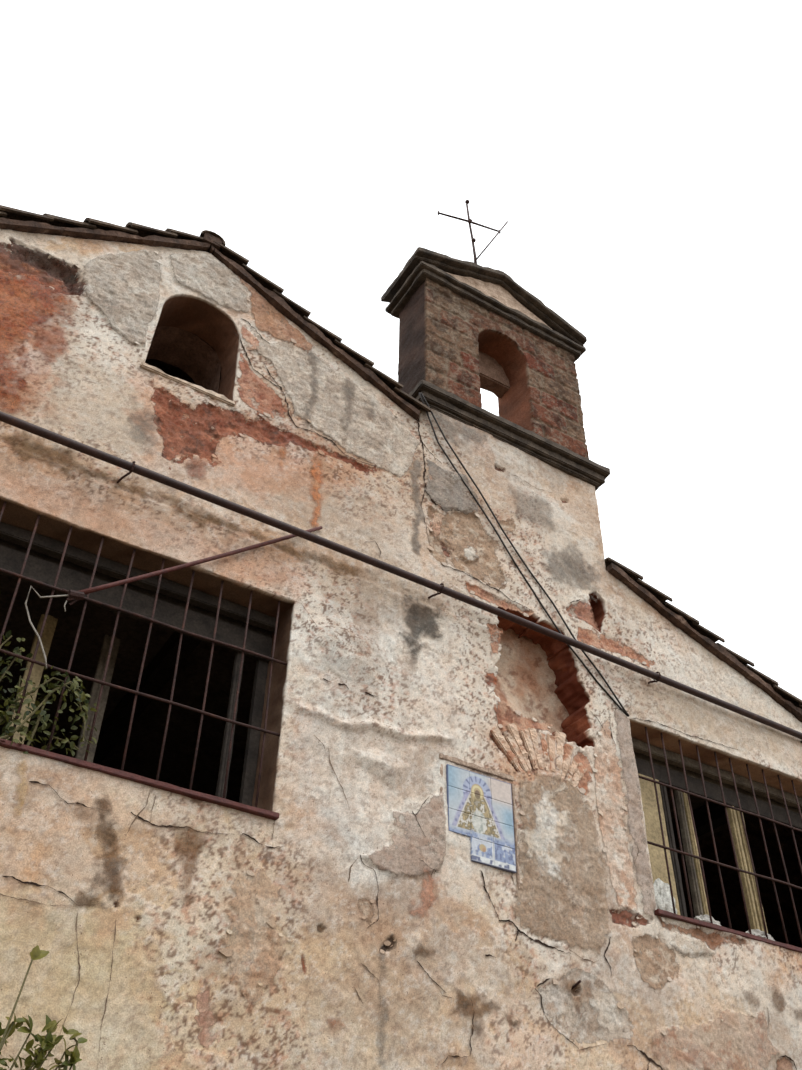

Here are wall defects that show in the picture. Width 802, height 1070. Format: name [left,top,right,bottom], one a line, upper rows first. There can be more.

peeling [0,239,419,477]
crack [233,318,375,466]
spalling [424,459,534,617]
spalling [485,673,497,687]
spalling [494,702,552,731]
water stain [76,798,123,905]
crack [29,781,283,848]
peeling [369,792,446,917]
peeling [512,710,746,989]
crack [0,876,116,1068]
crack [535,978,663,1070]
peeling [652,1010,793,1070]